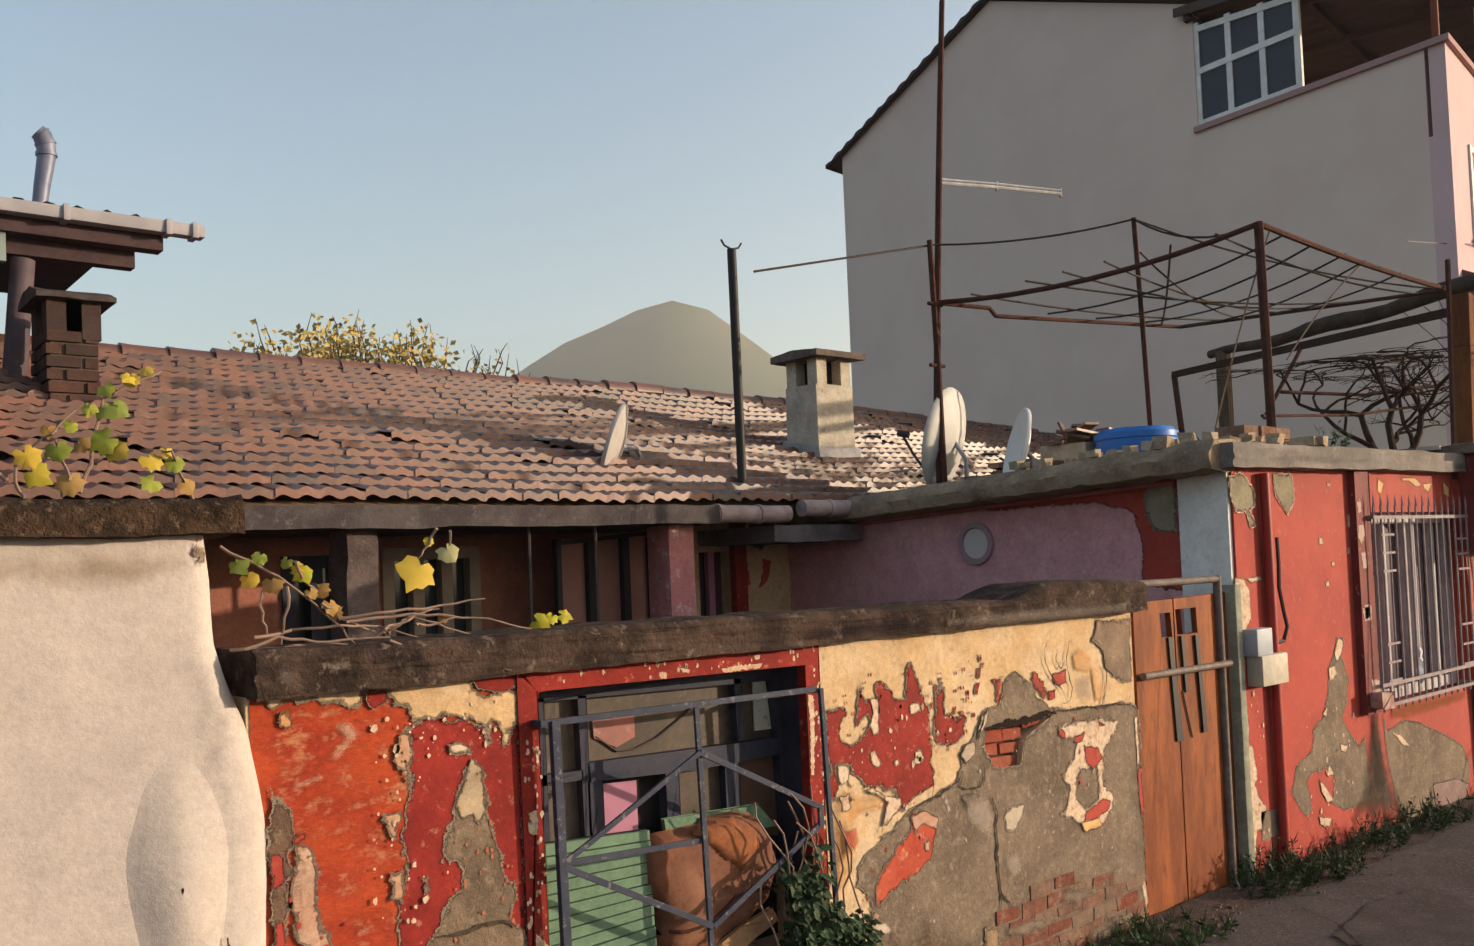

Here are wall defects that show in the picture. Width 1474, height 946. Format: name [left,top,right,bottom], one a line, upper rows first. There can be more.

spalling [748,438,1256,591]
flaking render [1273,472,1295,515]
peeling [1325,501,1367,587]
peeling [644,655,762,679]
peeling [1235,576,1261,662]
peeling [1362,604,1372,621]
flaking render [264,675,548,946]
flaking render [790,617,1149,946]
peeling [1247,691,1279,866]
flaking render [1292,637,1370,827]
flaking render [1383,716,1470,818]
crack [438,920,517,938]